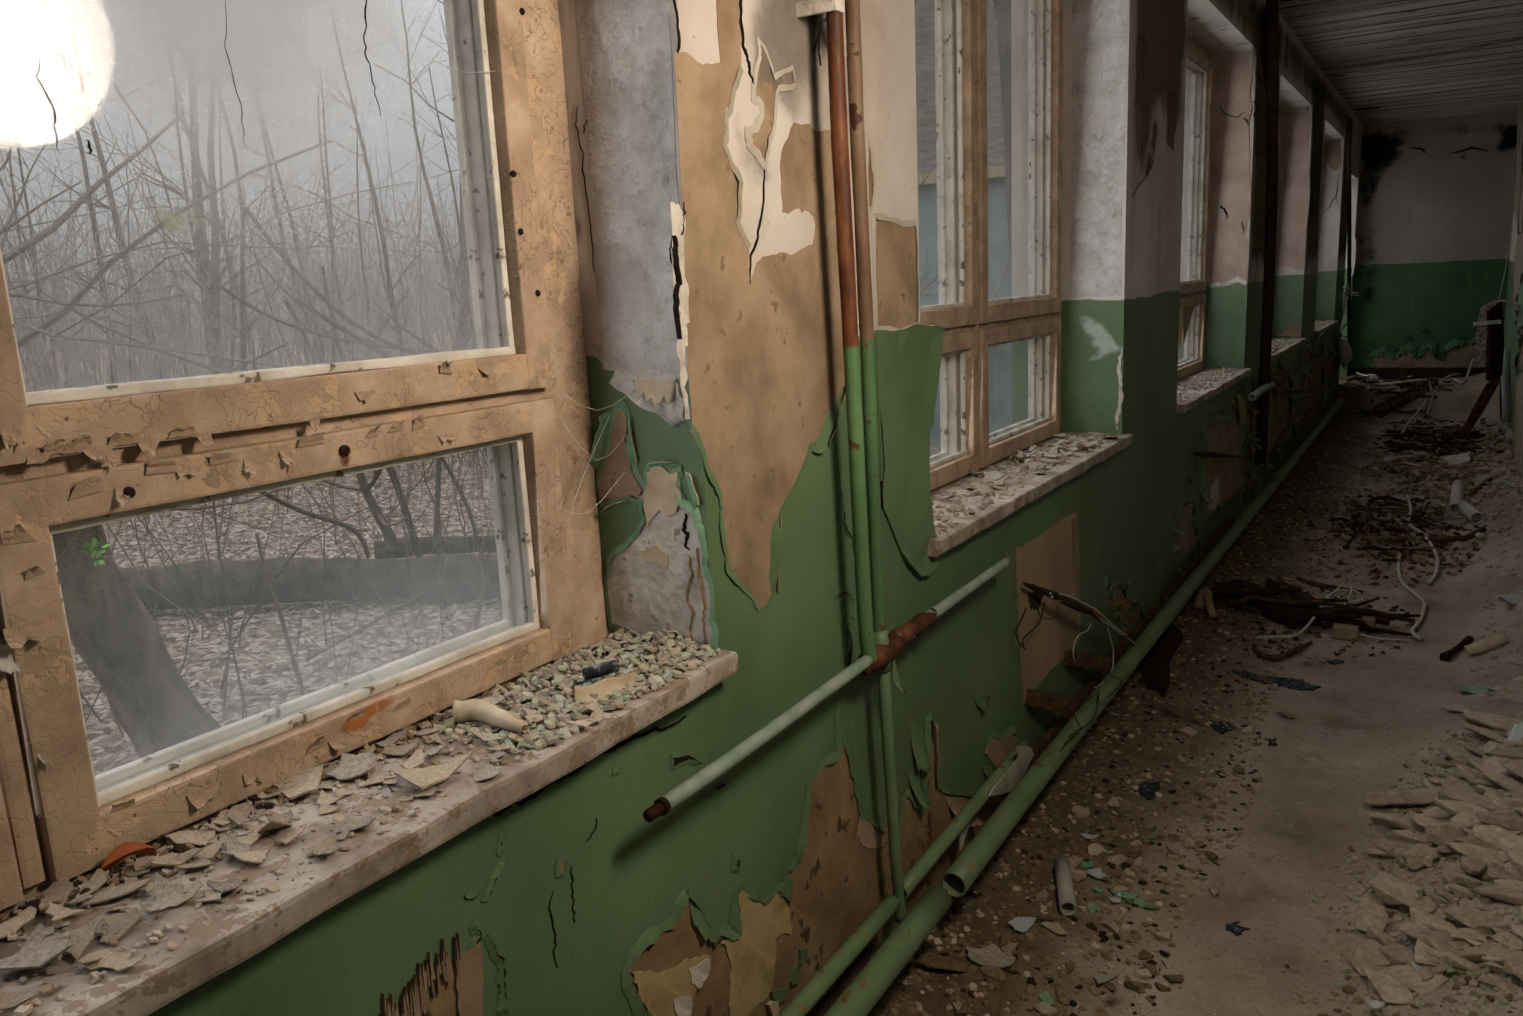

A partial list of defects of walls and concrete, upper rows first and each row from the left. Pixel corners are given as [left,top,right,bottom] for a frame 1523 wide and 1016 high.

crack [739,0,755,84]
water stain [1136,0,1200,176]
water stain [1223,0,1402,262]
crack [749,169,765,284]
peeling [585,0,846,650]
peeling [1514,272,1523,373]
corrosion [888,608,937,652]
flaking render [1015,512,1081,704]
peeling [621,712,1019,1016]
peeling [378,932,484,1016]